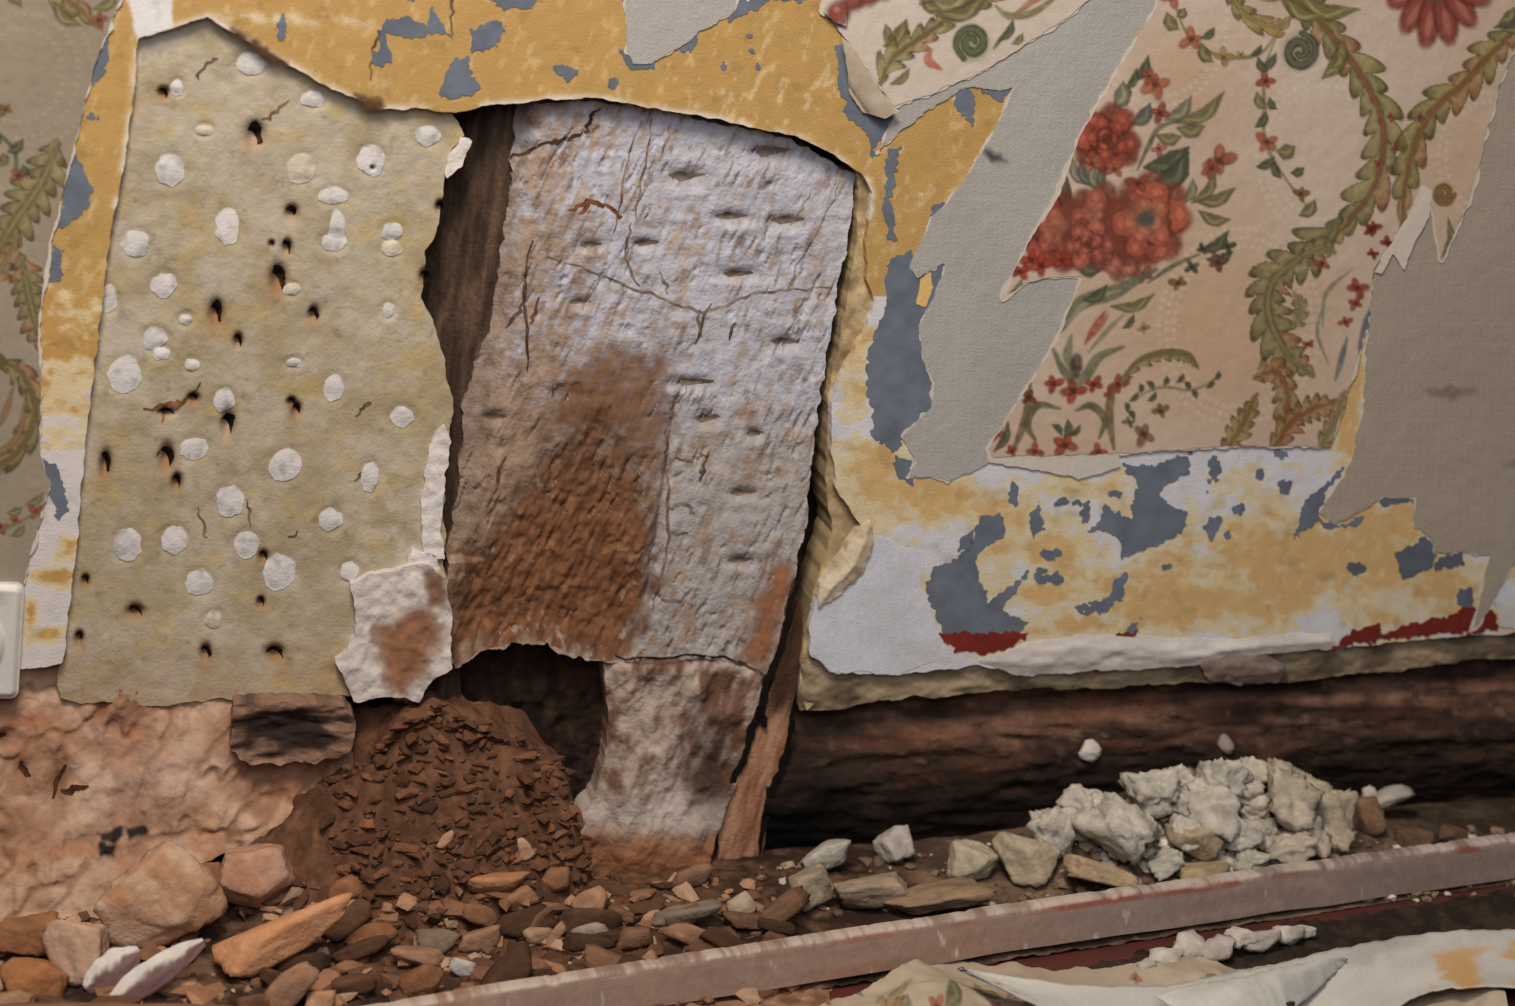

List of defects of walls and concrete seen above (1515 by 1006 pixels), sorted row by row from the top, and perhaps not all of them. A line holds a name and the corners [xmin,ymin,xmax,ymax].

crack [509,108,601,159]
peeling [608,49,655,89]
peeling [953,88,1011,127]
crack [505,118,841,441]
peeling [834,43,945,486]
spalling [42,0,604,801]
crack [494,456,506,493]
damp [373,357,670,694]
peeling [811,451,1245,675]
peeling [1255,449,1364,539]
peeling [1394,536,1465,580]
peeling [1332,586,1515,650]